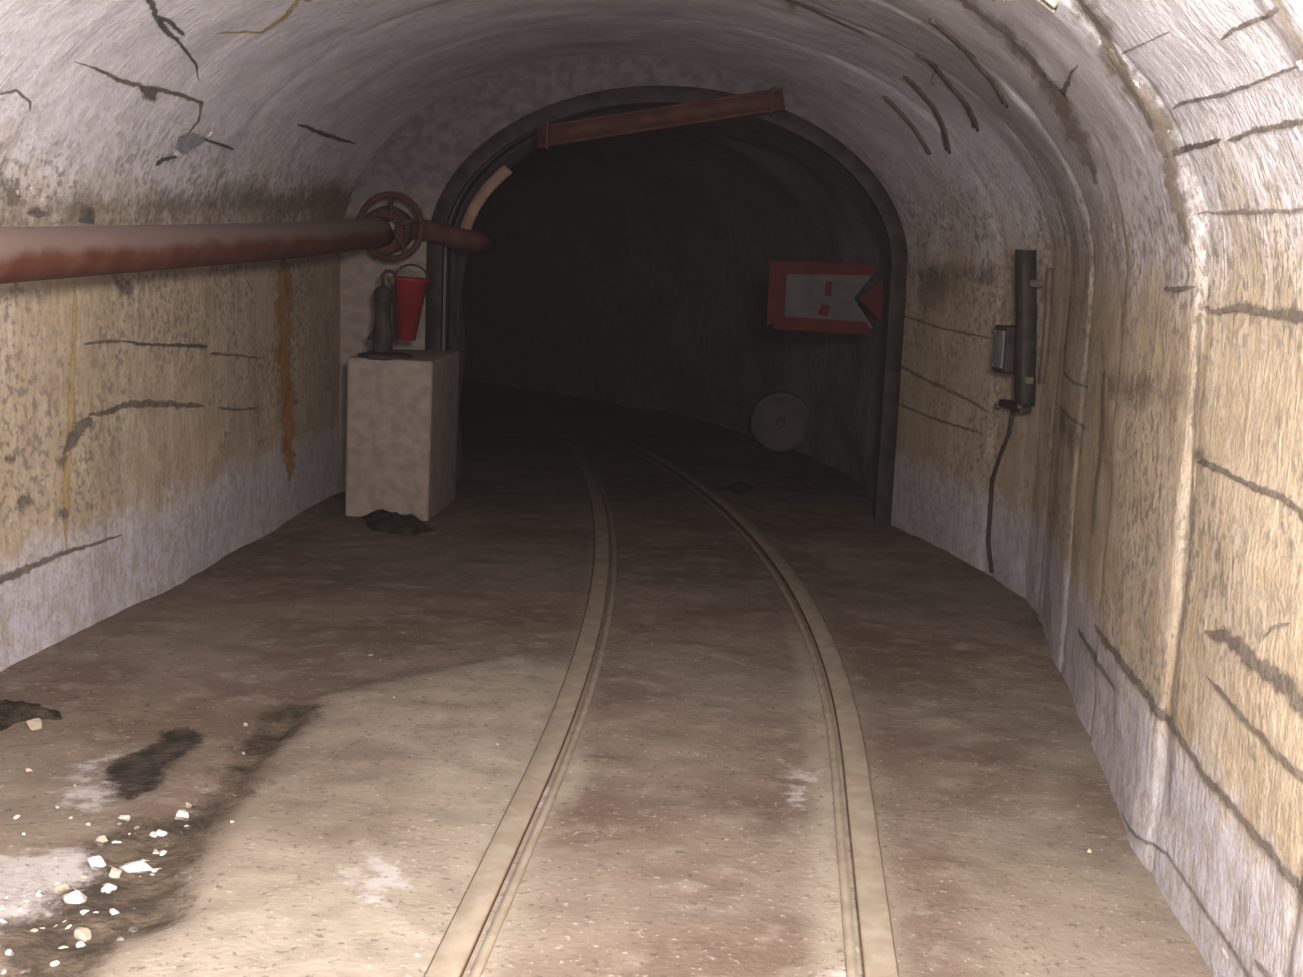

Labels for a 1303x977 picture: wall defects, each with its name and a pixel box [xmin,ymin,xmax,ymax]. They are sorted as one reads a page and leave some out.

crack [76,0,204,135]
rust [275,260,297,481]
crack [1197,461,1303,521]
damp [78,754,120,771]